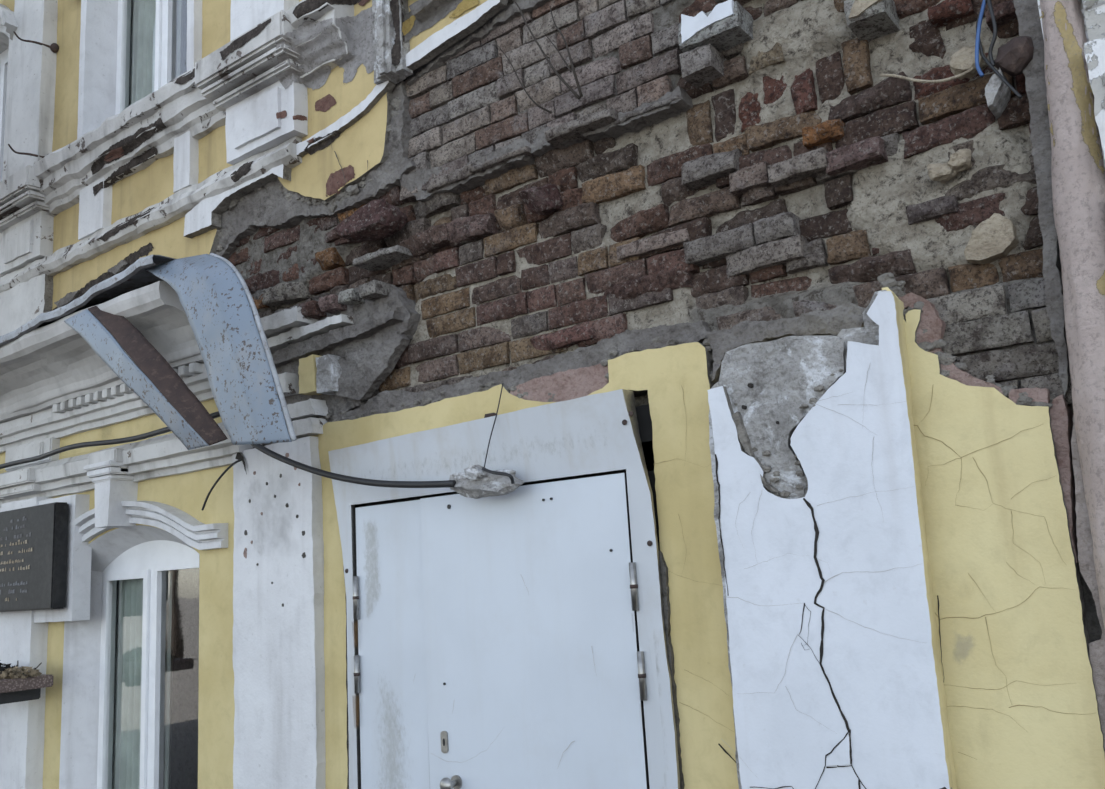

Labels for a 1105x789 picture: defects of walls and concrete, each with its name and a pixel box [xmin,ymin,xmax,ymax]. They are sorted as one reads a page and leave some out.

peeling [52,242,154,311]
spalling [215,0,1105,749]
spalling [659,551,685,789]
crack [655,366,1093,789]